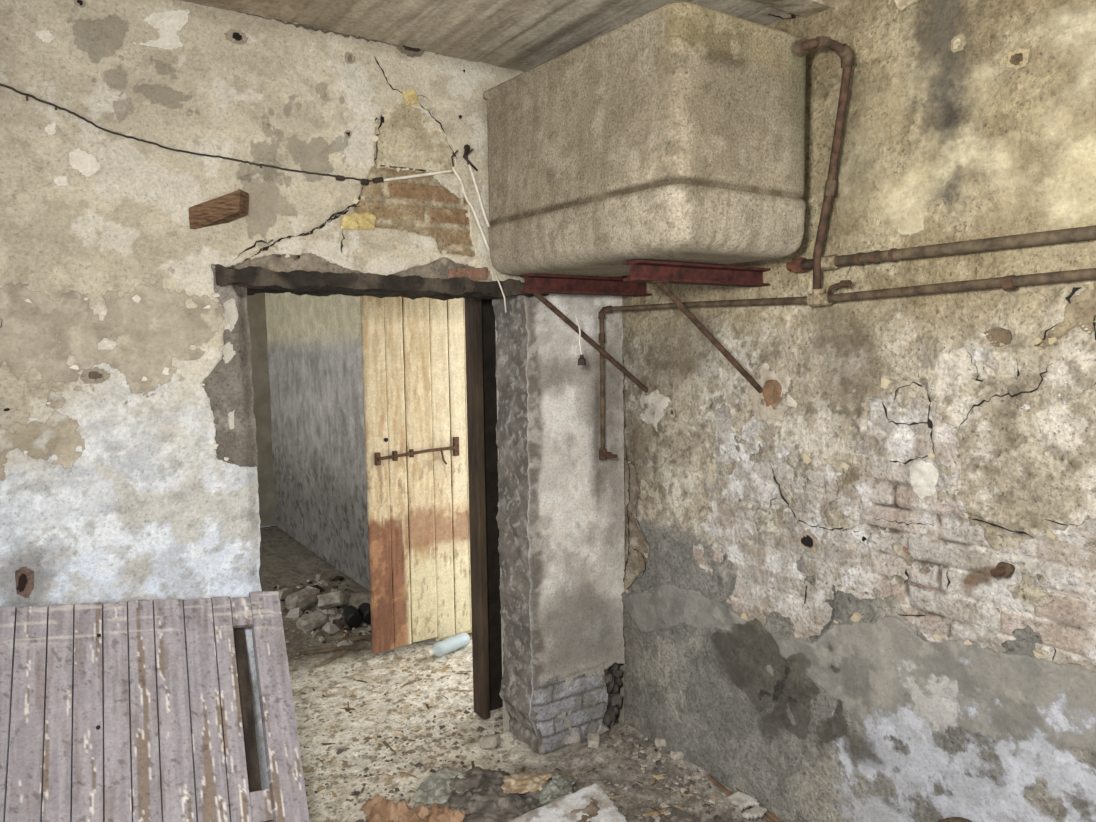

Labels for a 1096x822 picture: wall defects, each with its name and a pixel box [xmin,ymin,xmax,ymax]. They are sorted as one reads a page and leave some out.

crack [226,9,457,159]
leakage [1057,12,1096,90]
crack [232,115,382,262]
flaking render [353,104,493,282]
leakage [879,101,1096,230]
peeling [0,253,364,480]
crack [882,287,1082,464]
crack [768,467,934,532]
flaking render [693,378,1096,672]
crack [961,514,1078,535]
flaking render [531,663,623,754]
leakage [710,618,1096,822]